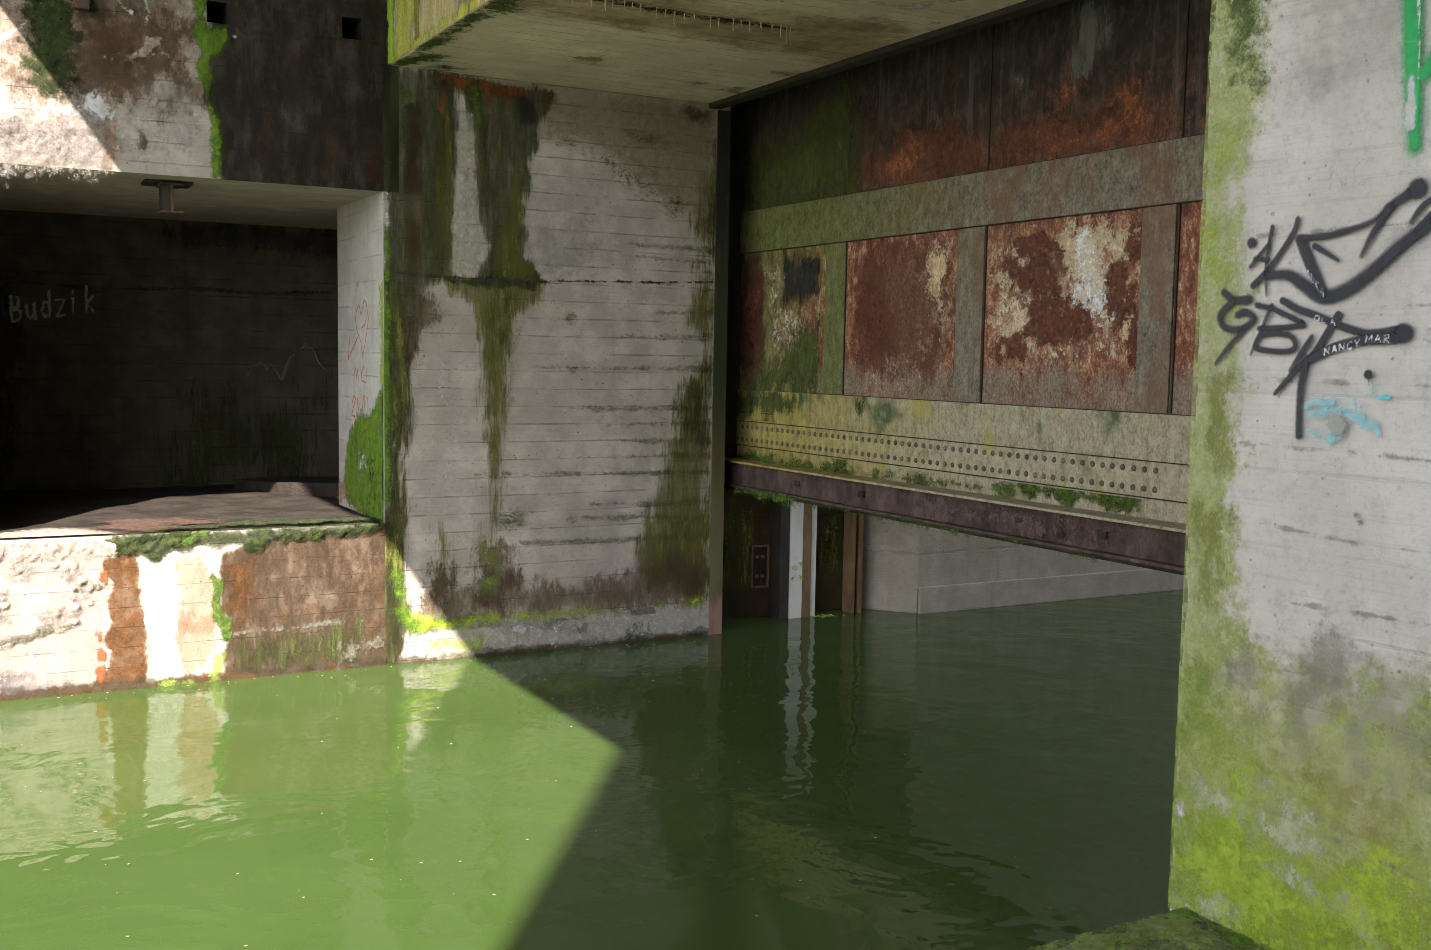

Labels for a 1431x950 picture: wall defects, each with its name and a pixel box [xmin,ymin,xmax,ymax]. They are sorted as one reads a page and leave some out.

water stain [27,89,117,123]
water stain [451,109,481,271]
corrosion [740,253,767,386]
corrosion [848,236,956,381]
corrosion [991,209,1143,376]
corrosion [93,553,149,687]
water stain [0,525,708,701]
water stain [1177,755,1380,913]